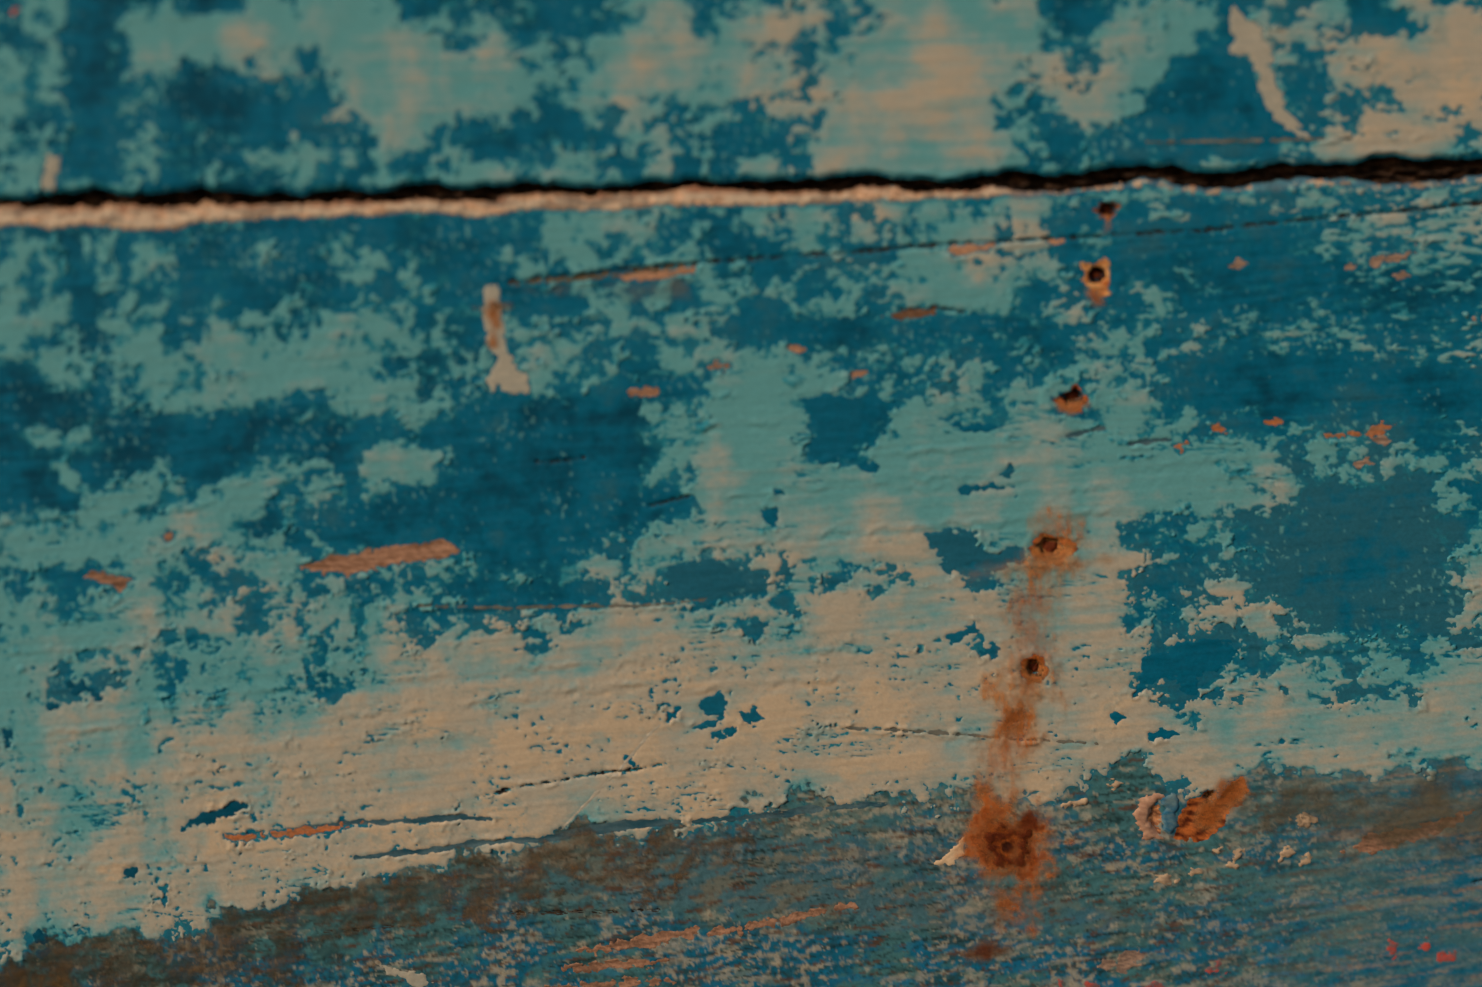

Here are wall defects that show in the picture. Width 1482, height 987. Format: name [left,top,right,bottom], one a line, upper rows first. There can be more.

peeling [0,0,1223,197]
crack [1145,136,1353,144]
peeling [1196,0,1482,170]
crack [497,200,1482,287]
crack [899,305,965,313]
corrosion [1057,401,1081,413]
peeling [0,177,1482,965]
corrosion [1010,508,1082,607]
corrosion [982,654,1054,760]
corrosion [963,788,1053,910]
corrosion [1197,778,1244,828]